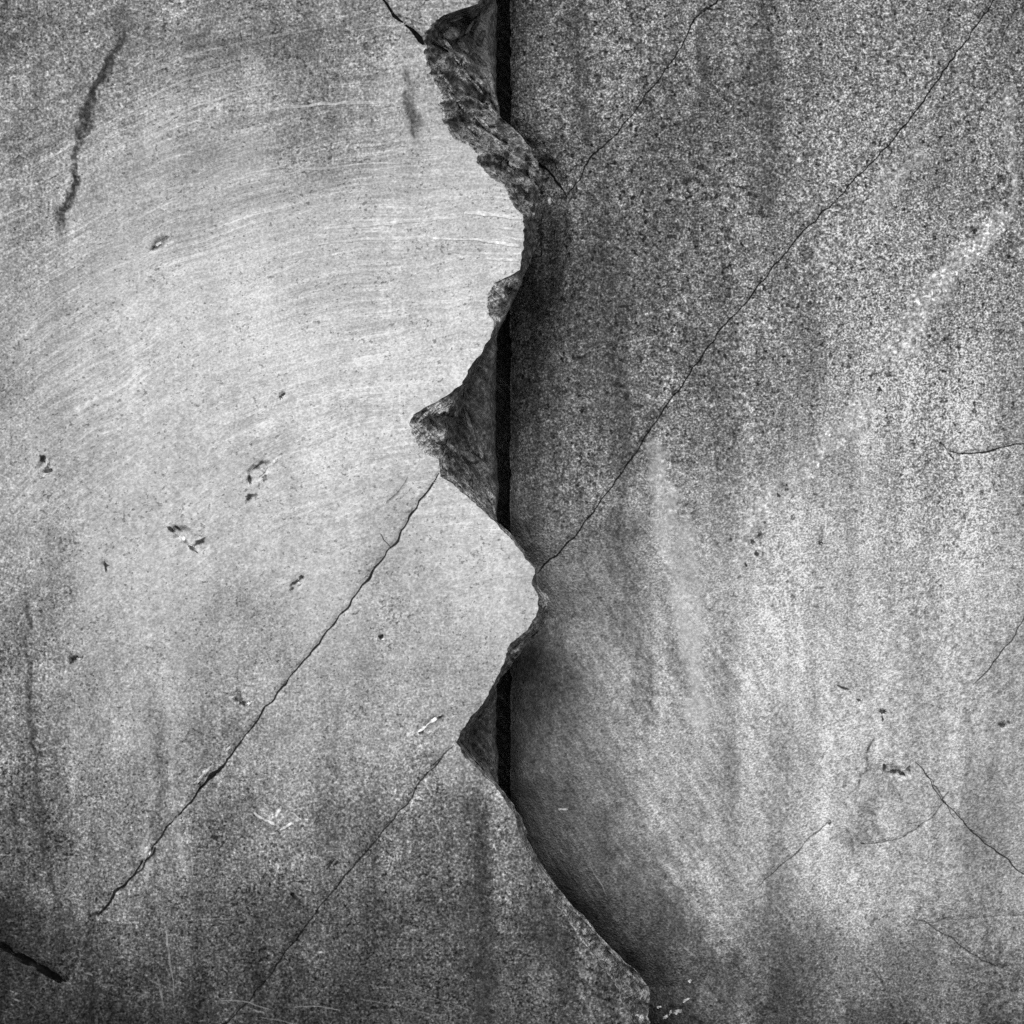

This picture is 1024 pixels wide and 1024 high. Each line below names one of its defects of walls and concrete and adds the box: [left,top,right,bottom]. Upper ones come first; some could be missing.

crack [383,0,424,44]
crack [538,0,993,573]
spalling [409,0,689,1024]
crack [937,439,1024,458]
crack [97,473,439,917]
crack [0,942,67,983]
crack [226,746,453,1024]